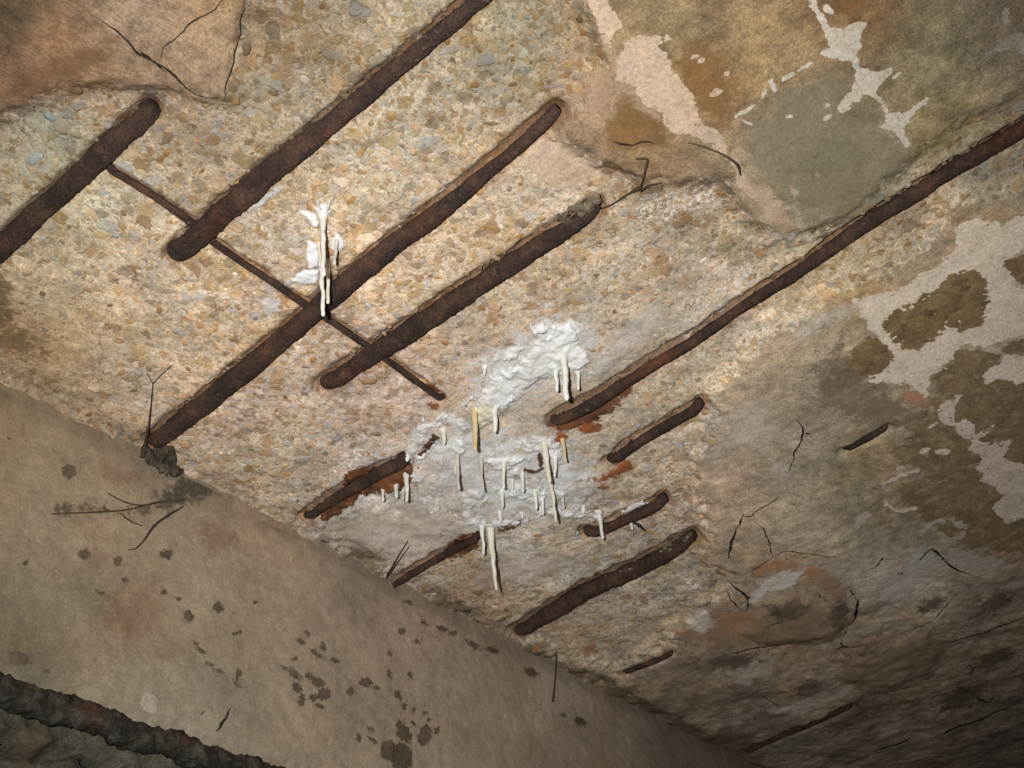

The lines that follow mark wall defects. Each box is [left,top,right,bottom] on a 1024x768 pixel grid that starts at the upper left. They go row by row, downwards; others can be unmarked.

crack [81,0,245,100]
spalling [0,0,465,231]
rust [606,98,664,147]
spalling [0,169,303,449]
efflorescence [291,200,345,316]
spalling [160,0,1024,688]
rust [320,434,439,521]
efflorescence [337,260,755,591]
rust [546,386,632,443]
crack [789,419,811,471]
water stain [813,269,1024,555]
crack [722,497,840,612]